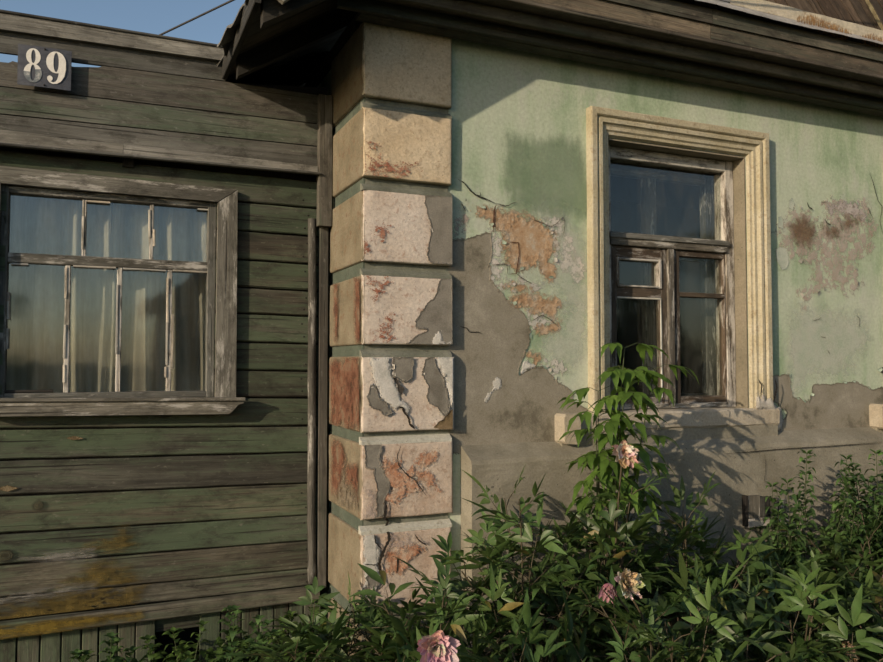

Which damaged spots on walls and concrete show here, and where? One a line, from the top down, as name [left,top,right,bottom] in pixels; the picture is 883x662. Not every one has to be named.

spalling [329,195,589,454]
peeling [771,197,883,431]
peeling [331,440,441,518]
crack [365,498,399,590]
peeling [363,533,430,590]